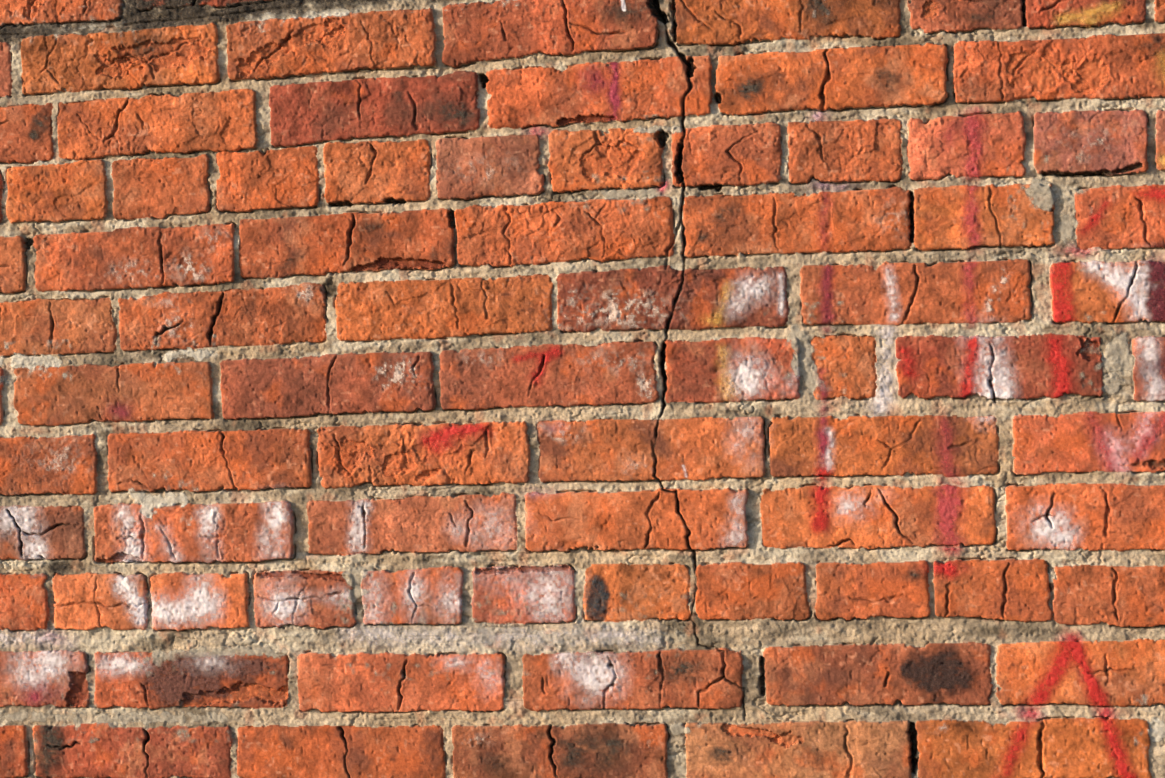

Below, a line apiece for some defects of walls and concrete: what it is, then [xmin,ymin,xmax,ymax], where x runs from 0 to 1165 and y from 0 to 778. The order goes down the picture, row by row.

crack [156,321,183,345]
crack [208,293,224,342]
crack [653,0,744,708]
crack [7,510,23,556]
damp [15,507,46,559]
damp [200,508,219,537]
damp [262,503,285,557]
crack [867,493,904,536]
damp [188,578,213,616]